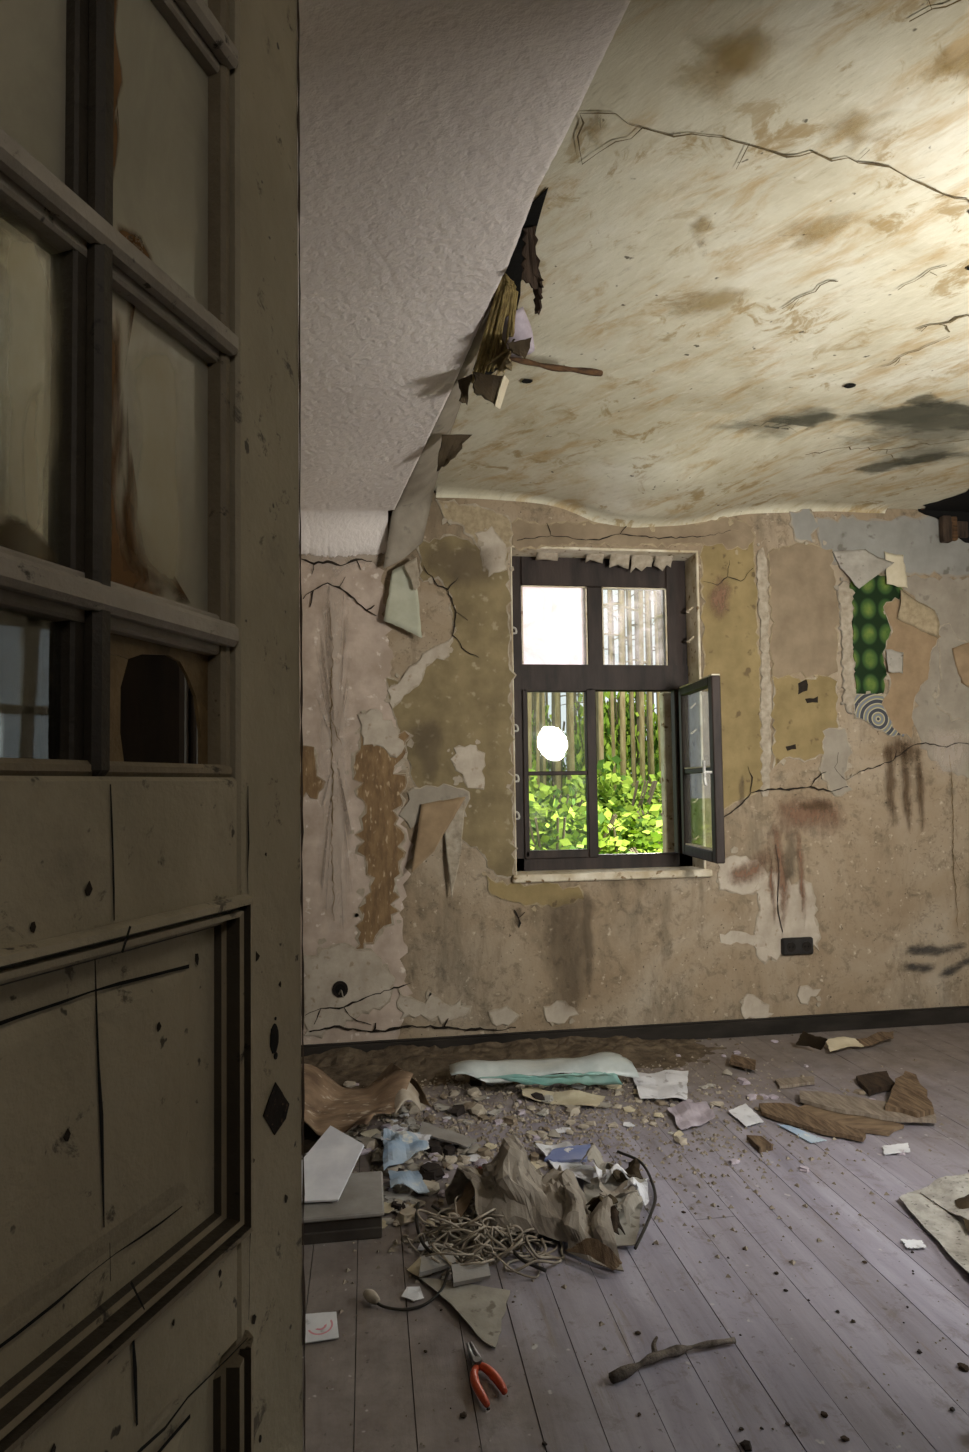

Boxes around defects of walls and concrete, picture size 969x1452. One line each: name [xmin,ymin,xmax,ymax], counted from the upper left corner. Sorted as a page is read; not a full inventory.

crack [577,112,969,202]
leakage [747,413,836,429]
leakage [855,395,969,472]
flaking render [789,508,969,778]
flaking render [299,504,585,1045]
leakage [886,741,923,827]
flaking render [685,843,822,965]
crack [306,982,516,1033]